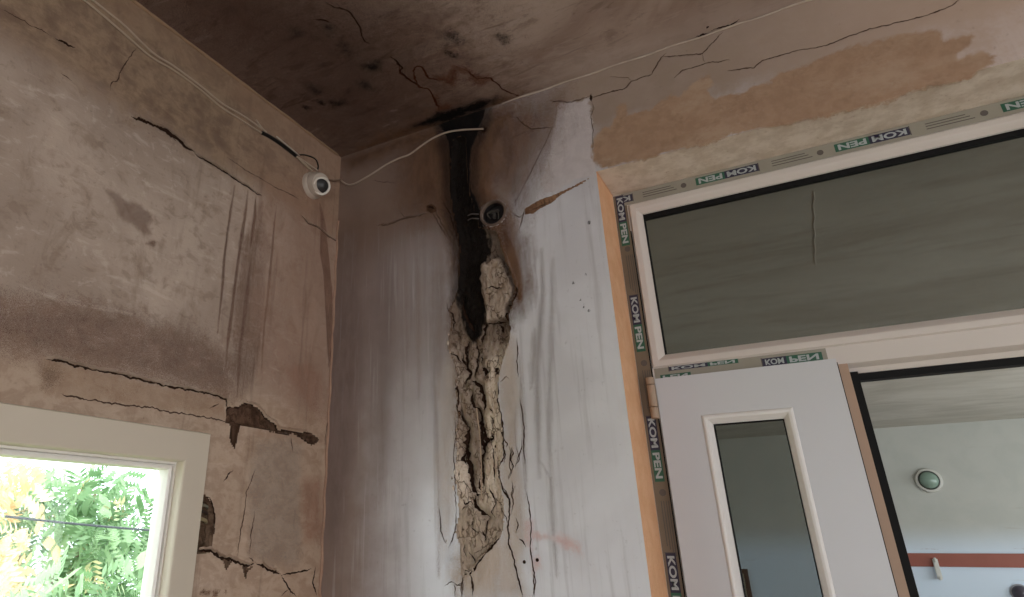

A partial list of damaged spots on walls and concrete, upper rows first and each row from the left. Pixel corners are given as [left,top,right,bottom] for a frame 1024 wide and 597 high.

crack [110,50,135,91]
crack [131,114,337,241]
crack [314,3,370,44]
water stain [137,0,563,153]
crack [391,57,440,110]
crack [552,1,957,131]
peeling [525,29,996,215]
crack [46,355,229,422]
water stain [0,154,584,597]
flaking render [447,136,518,578]
crack [199,471,317,595]